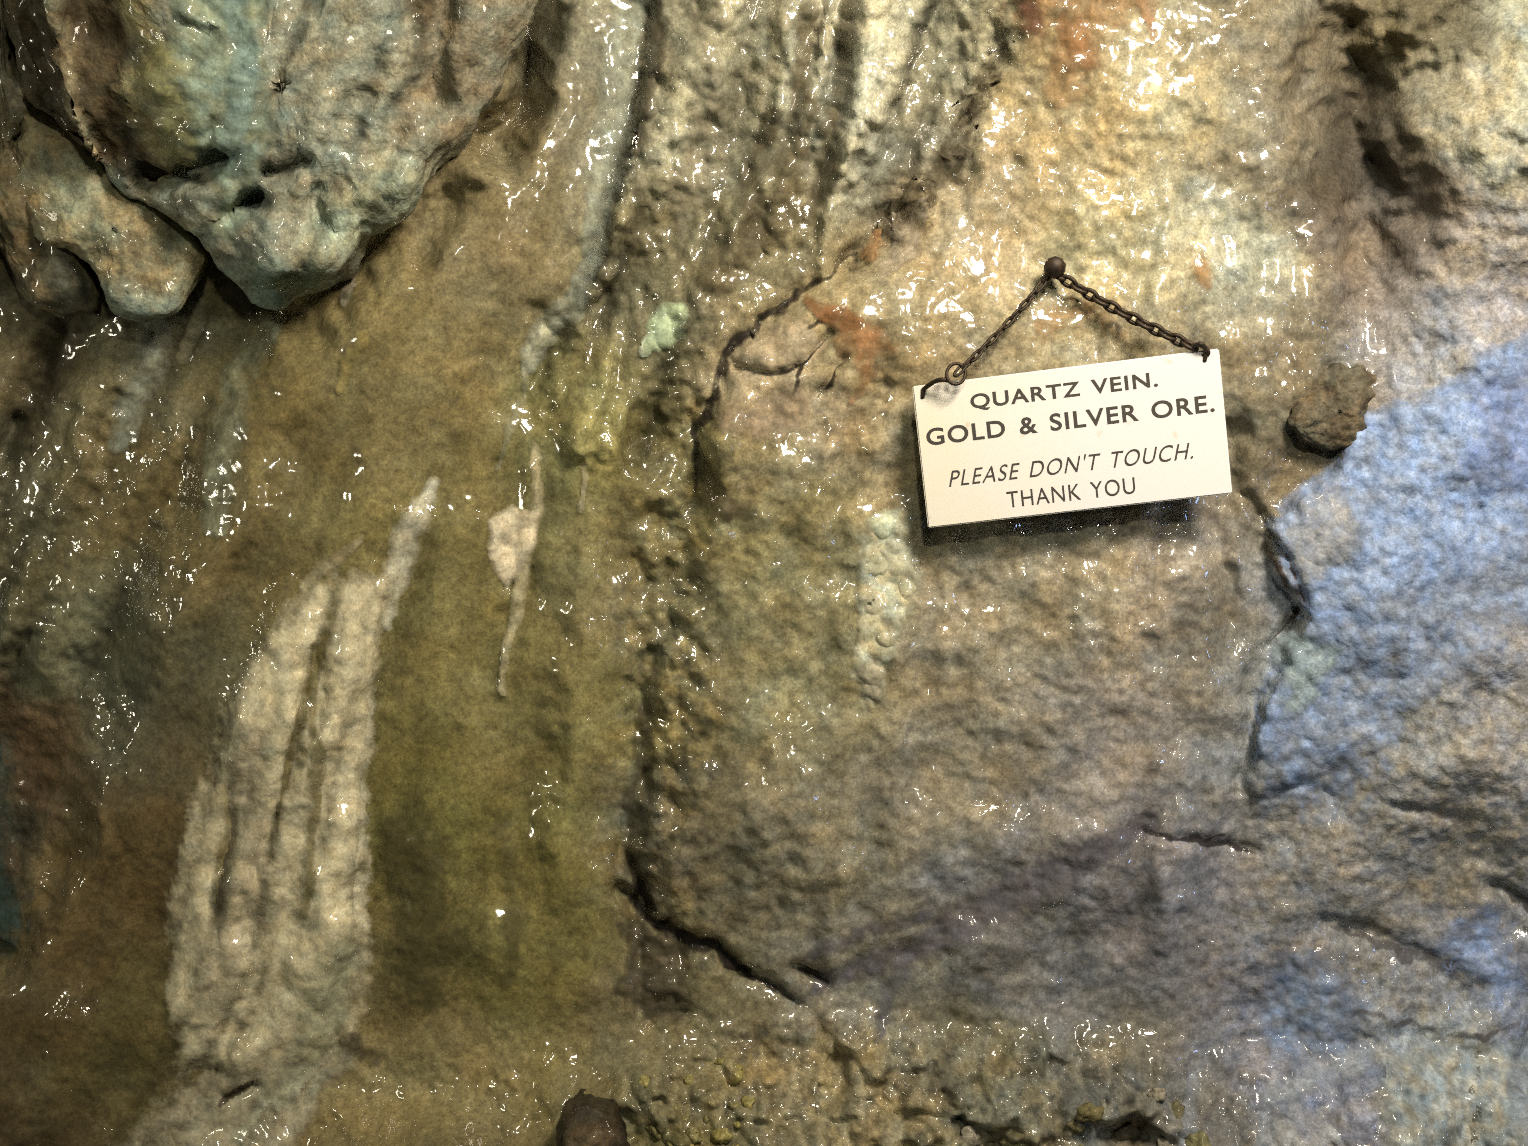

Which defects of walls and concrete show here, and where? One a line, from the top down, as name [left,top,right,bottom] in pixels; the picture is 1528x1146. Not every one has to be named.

crack [691,50,1003,490]
crack [1143,828,1252,852]
crack [621,860,827,1000]